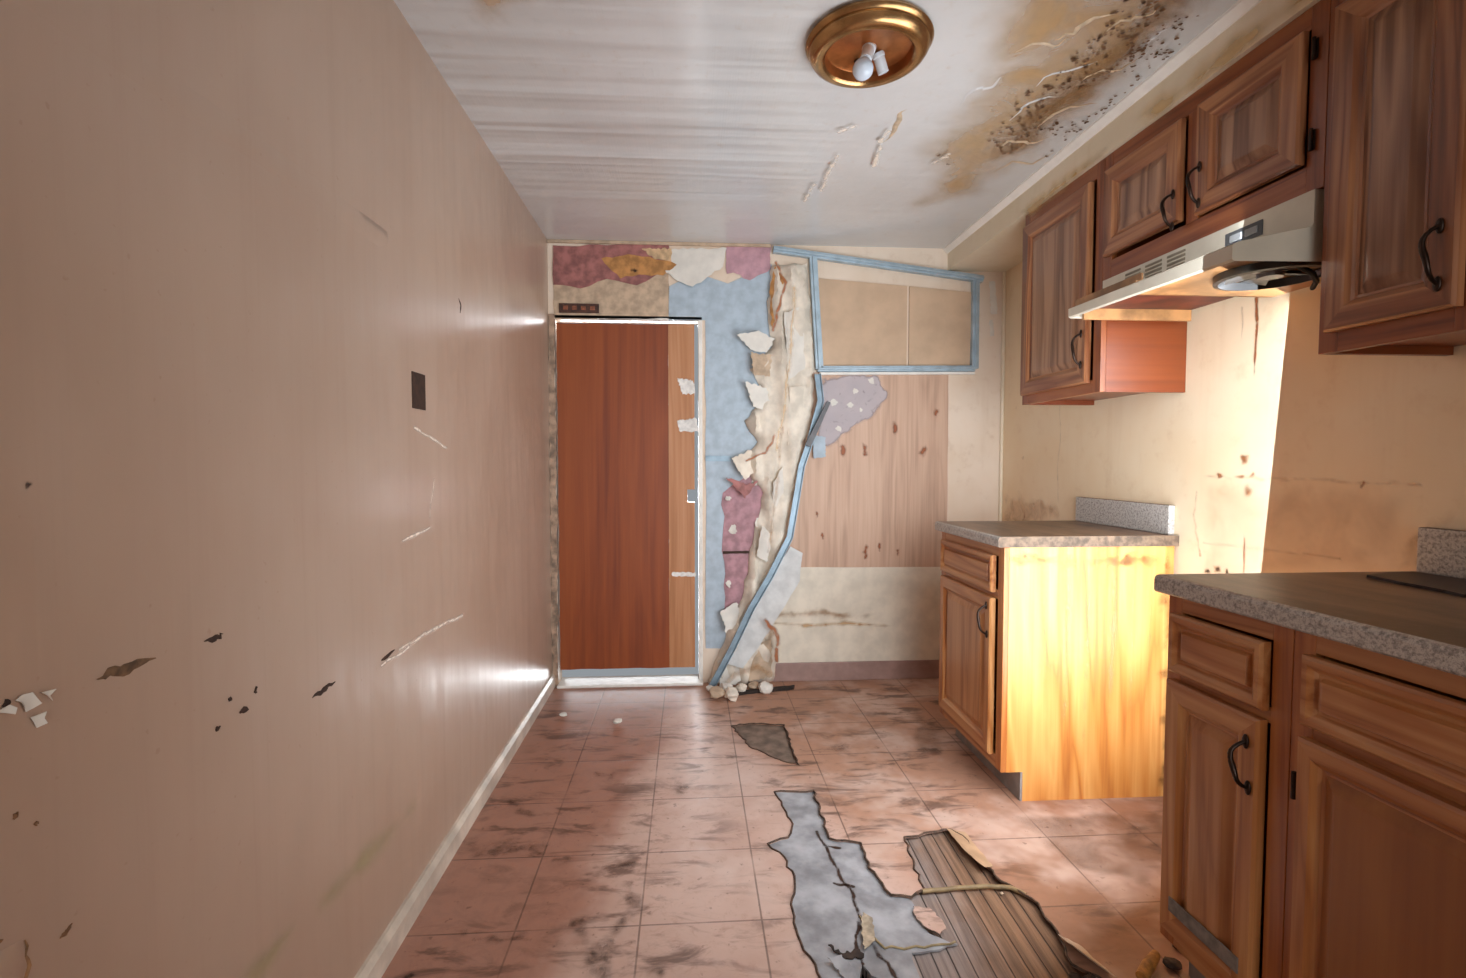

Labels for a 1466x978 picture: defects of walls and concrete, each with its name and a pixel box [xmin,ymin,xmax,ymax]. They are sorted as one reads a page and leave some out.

water stain [937,0,1199,192]
peeling [553,244,677,289]
peeling [726,247,805,416]
peeling [720,450,784,632]
spalling [0,689,56,728]
spalling [97,658,156,680]